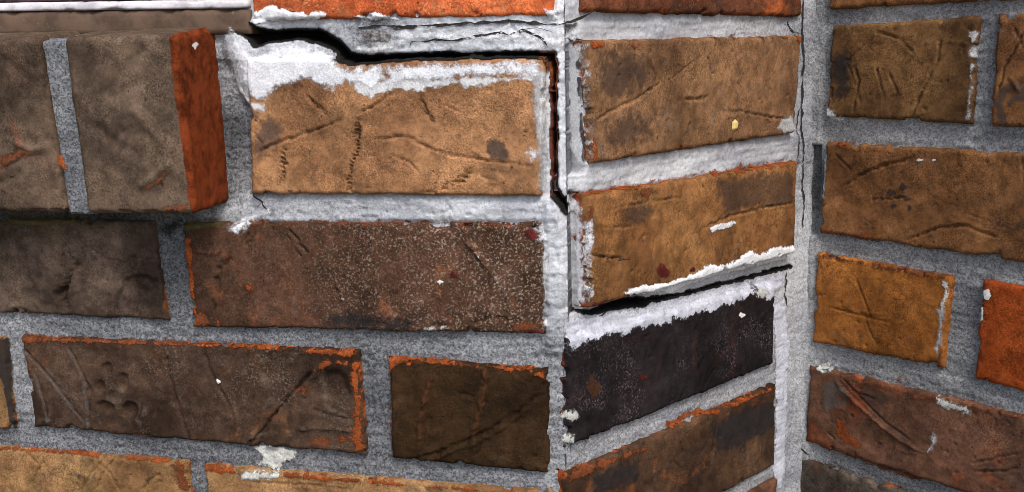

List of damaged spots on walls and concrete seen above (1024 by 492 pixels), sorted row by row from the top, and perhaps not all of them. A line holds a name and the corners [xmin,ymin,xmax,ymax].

crack [235,8,592,216]
crack [787,0,805,227]
crack [570,264,793,317]